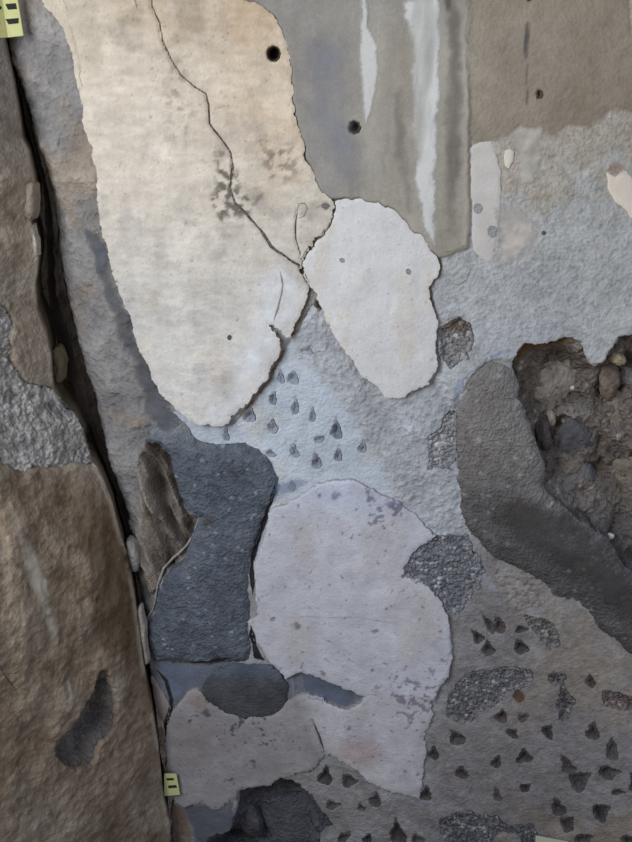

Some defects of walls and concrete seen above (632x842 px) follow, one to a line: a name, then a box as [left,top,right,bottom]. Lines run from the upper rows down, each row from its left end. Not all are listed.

crack [134,0,332,335]
water stain [360,0,378,123]
water stain [403,0,449,241]
water stain [449,15,459,154]
flaking render [512,335,632,570]